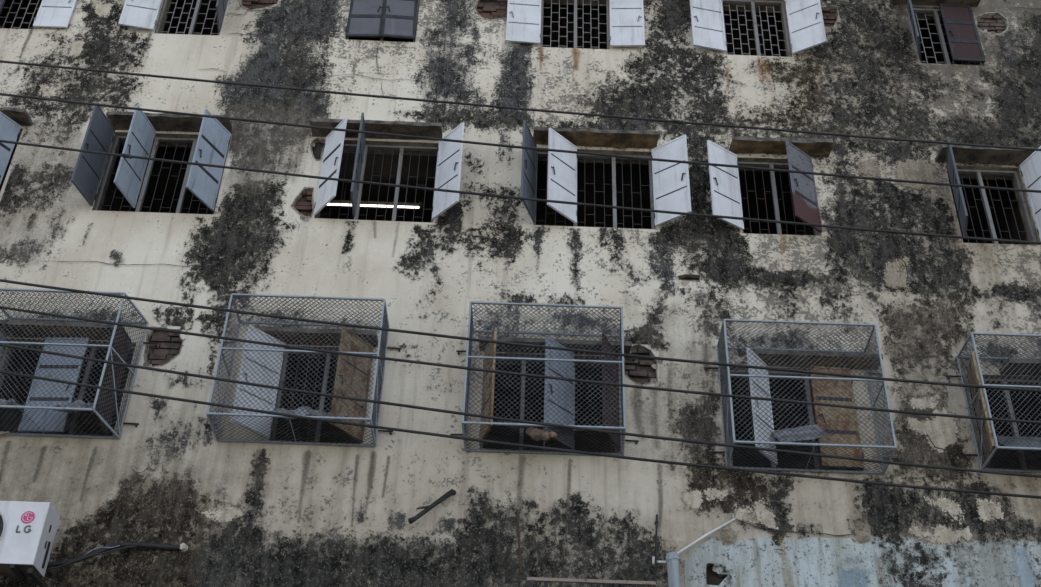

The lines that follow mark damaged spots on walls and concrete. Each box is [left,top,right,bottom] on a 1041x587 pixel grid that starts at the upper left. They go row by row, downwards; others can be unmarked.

spalling [236,0,281,12]
spalling [473,0,508,21]
spalling [821,1,839,28]
spalling [974,12,1010,35]
leakage [0,0,152,273]
leakage [152,0,367,388]
spalling [291,187,314,222]
leakage [393,0,1041,587]
spalling [143,324,184,368]
spalling [624,343,663,386]
leakage [0,389,823,587]
spalling [702,562,729,587]